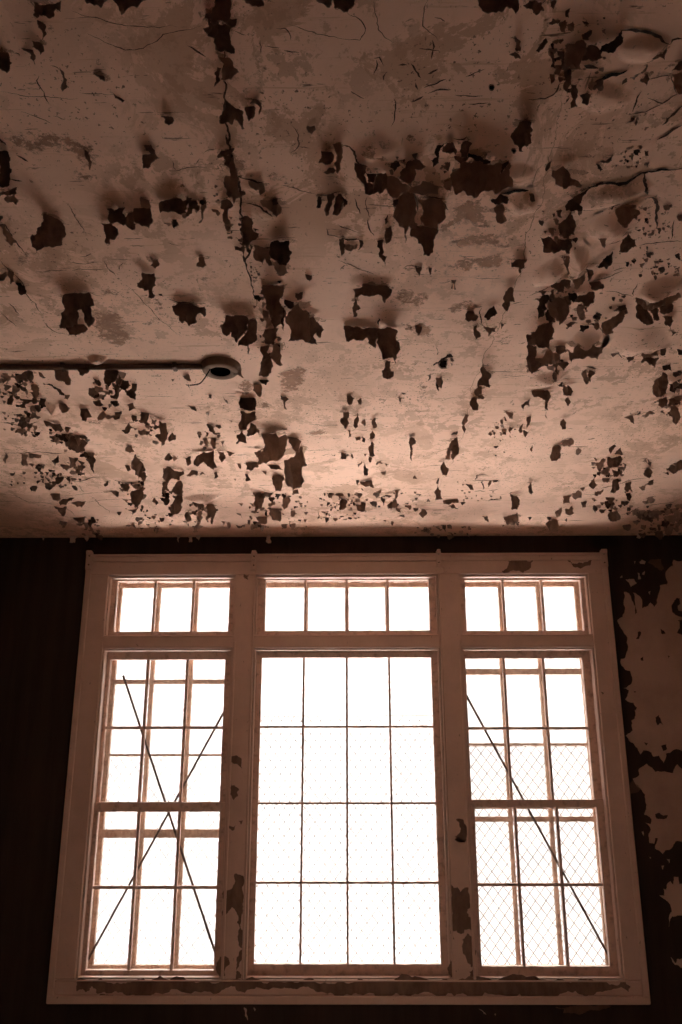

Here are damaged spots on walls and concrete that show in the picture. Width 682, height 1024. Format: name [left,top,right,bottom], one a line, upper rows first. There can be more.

peeling [0,0,61,73]
peeling [85,0,145,15]
peeling [199,0,270,129]
peeling [478,0,623,108]
crack [76,1,485,306]
peeling [510,119,535,152]
crack [581,168,682,245]
peeling [0,139,533,543]
peeling [488,145,682,461]
peeling [545,444,682,540]
peeling [617,559,682,869]
peeling [76,873,630,1015]